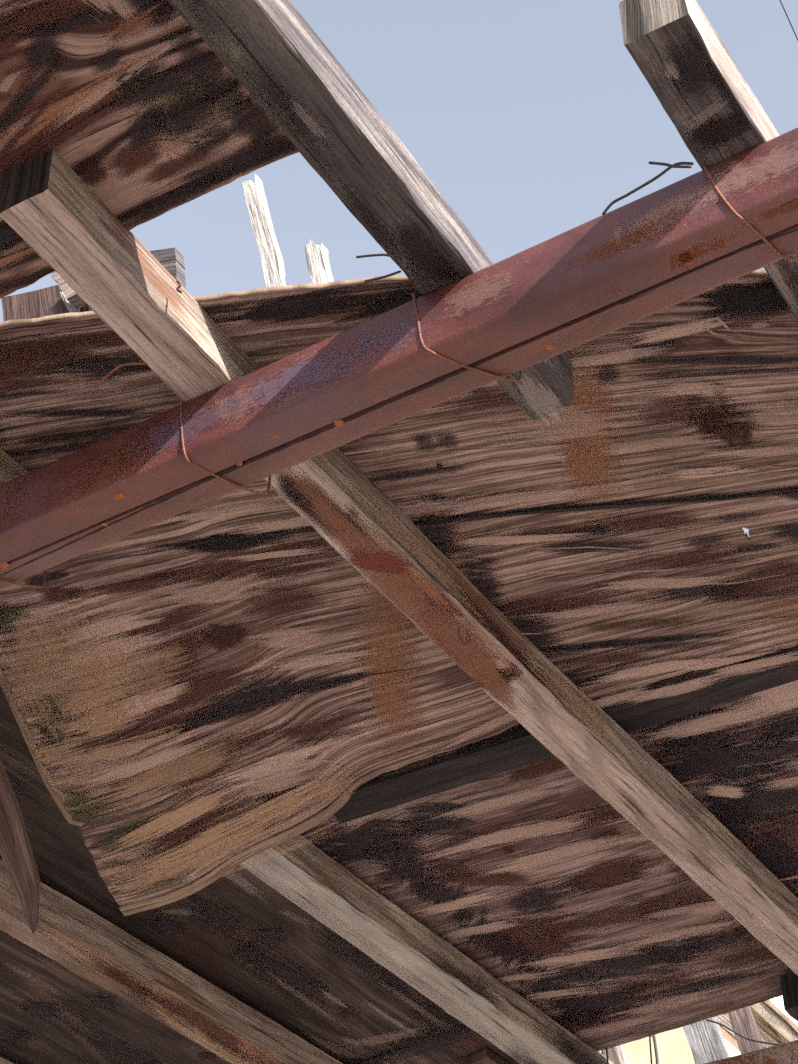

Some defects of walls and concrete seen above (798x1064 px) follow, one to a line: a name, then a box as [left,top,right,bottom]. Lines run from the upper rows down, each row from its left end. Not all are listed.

rust [658,238,725,270]